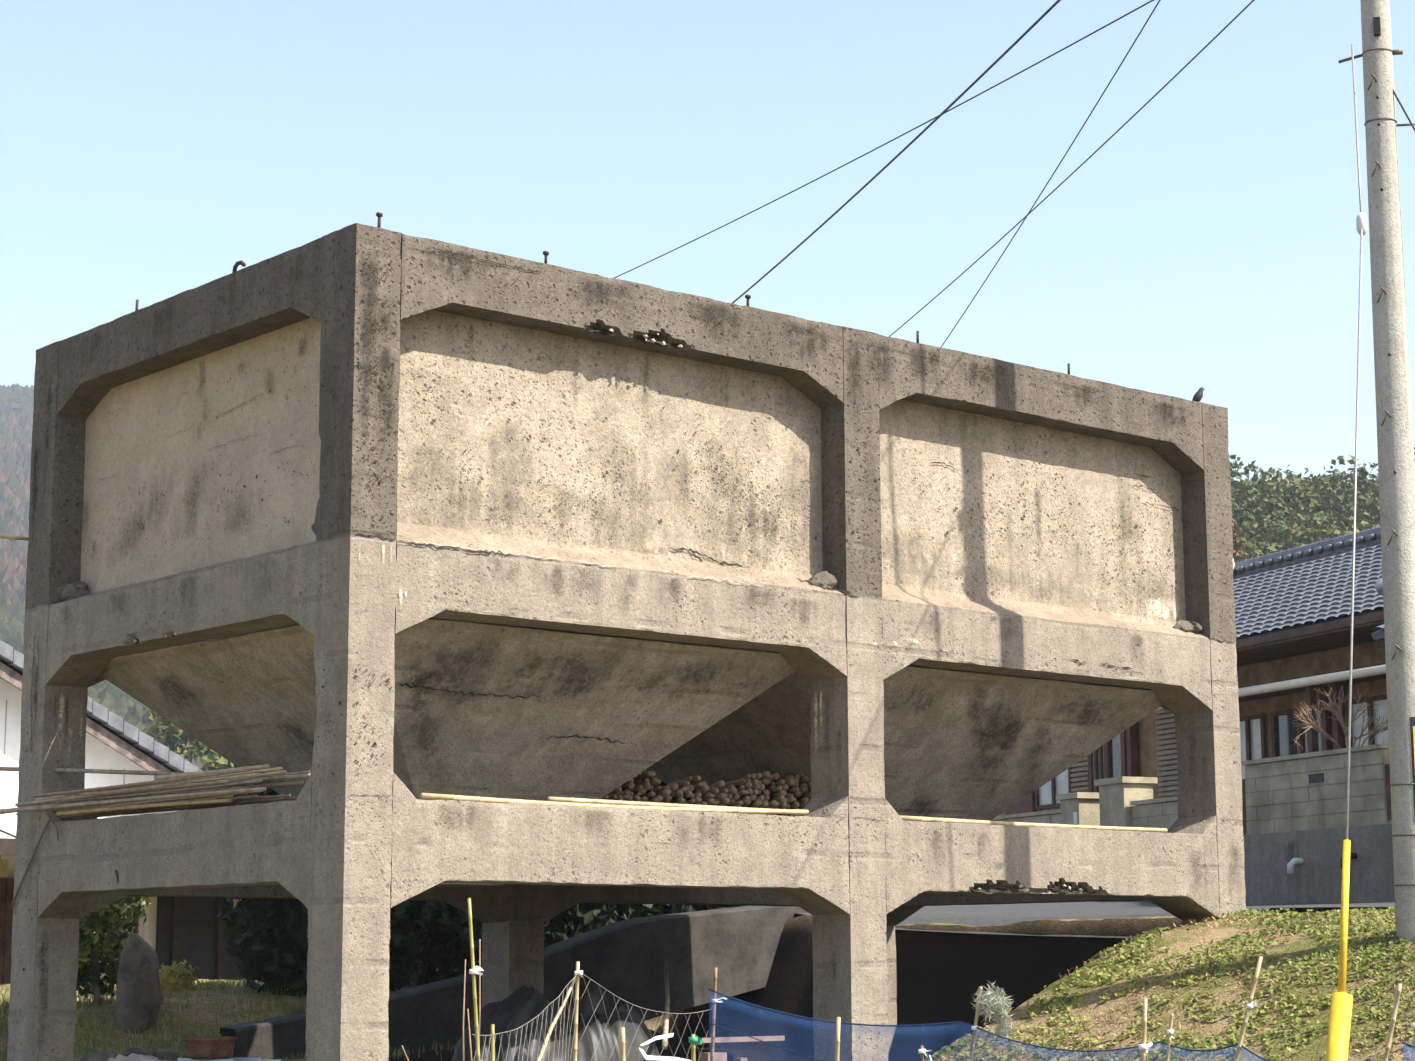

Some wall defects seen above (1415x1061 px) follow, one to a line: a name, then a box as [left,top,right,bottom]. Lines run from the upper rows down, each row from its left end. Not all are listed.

leakage [363,262,391,423]
crack [353,533,511,557]
crack [671,548,747,568]
crack [797,578,858,597]